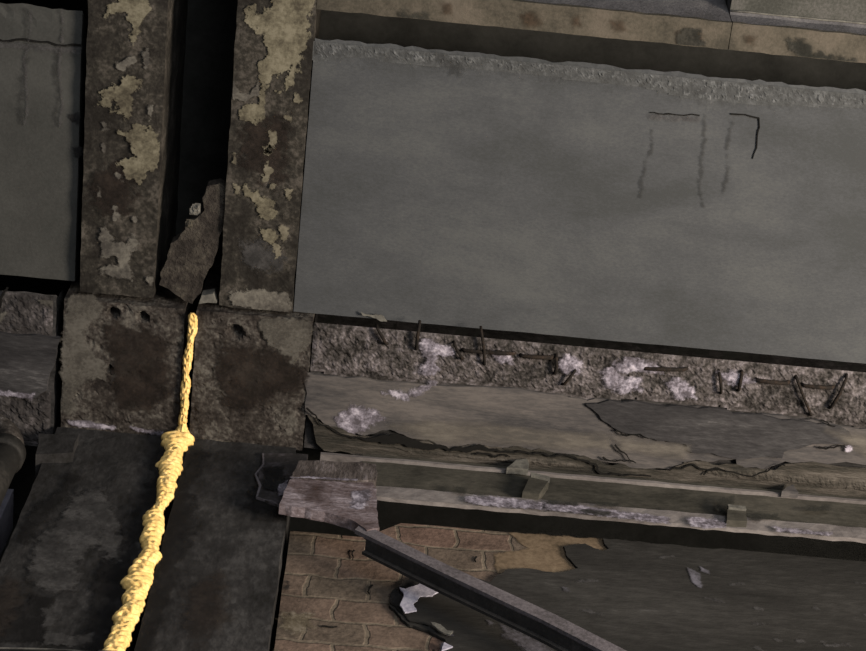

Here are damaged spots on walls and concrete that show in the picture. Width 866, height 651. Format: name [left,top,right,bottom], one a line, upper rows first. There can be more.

peeling [98,0,160,185]
peeling [98,205,140,282]
water stain [59,294,173,415]
water stain [212,289,313,415]
crack [306,408,785,477]
spalling [307,312,866,529]
crack [818,419,847,450]
peeling [389,579,557,651]
peeling [477,538,866,651]